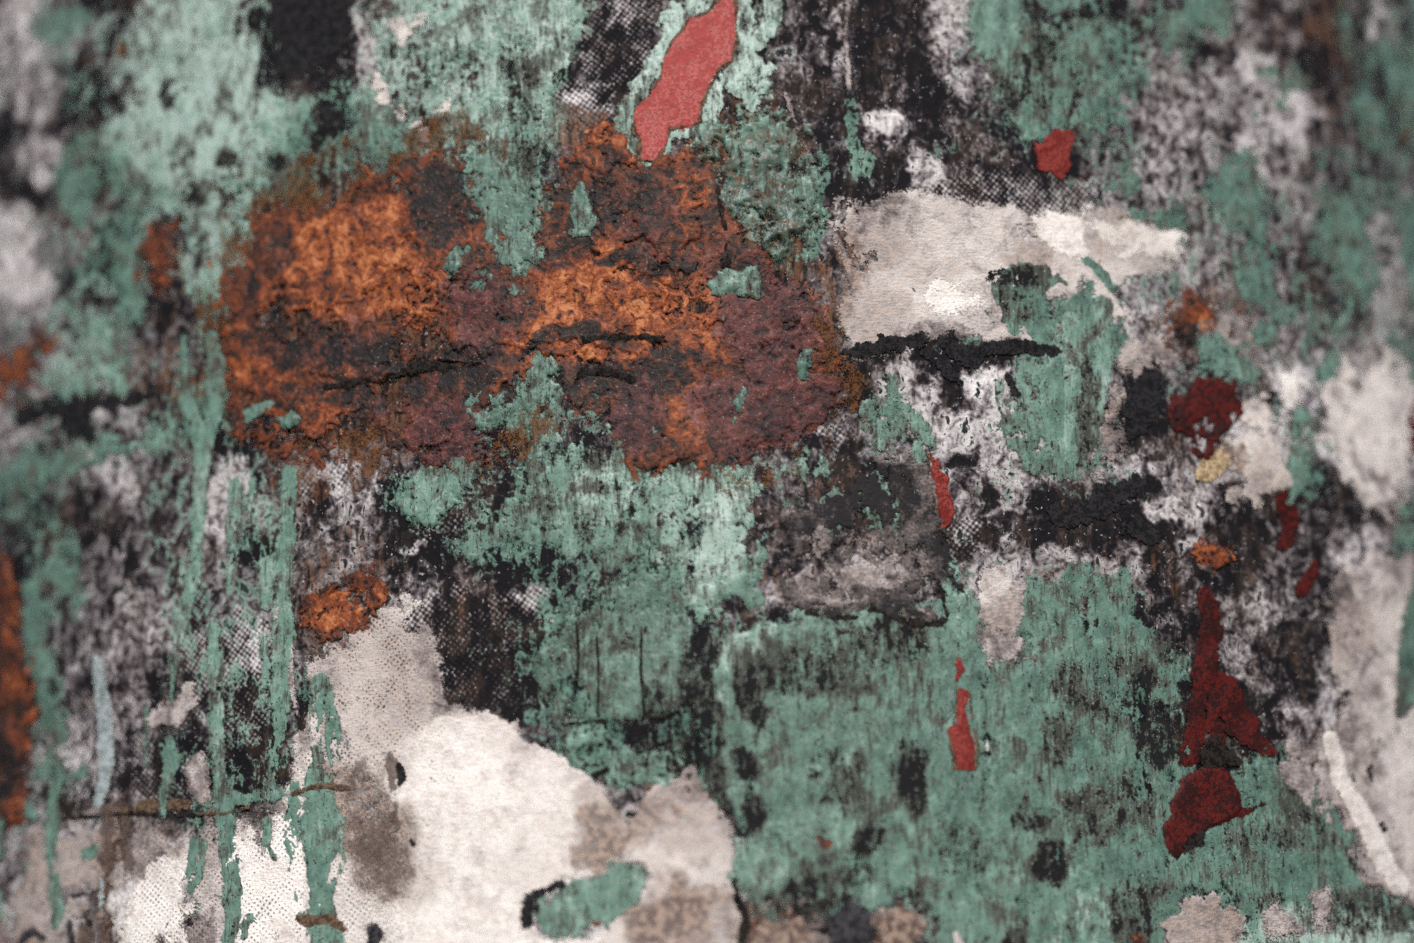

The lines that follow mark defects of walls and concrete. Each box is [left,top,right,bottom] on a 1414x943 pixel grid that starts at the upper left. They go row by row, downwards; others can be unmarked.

peeling [1275,59,1318,112]
rust [133,217,179,298]
rust [194,0,868,499]
peeling [922,0,1309,482]
peeling [1308,0,1414,393]
rust [0,324,61,411]
rust [0,552,44,860]
rust [299,561,389,644]
peeling [350,345,1414,943]
peeling [186,750,213,805]
peeling [123,854,200,943]
peeling [226,814,308,943]